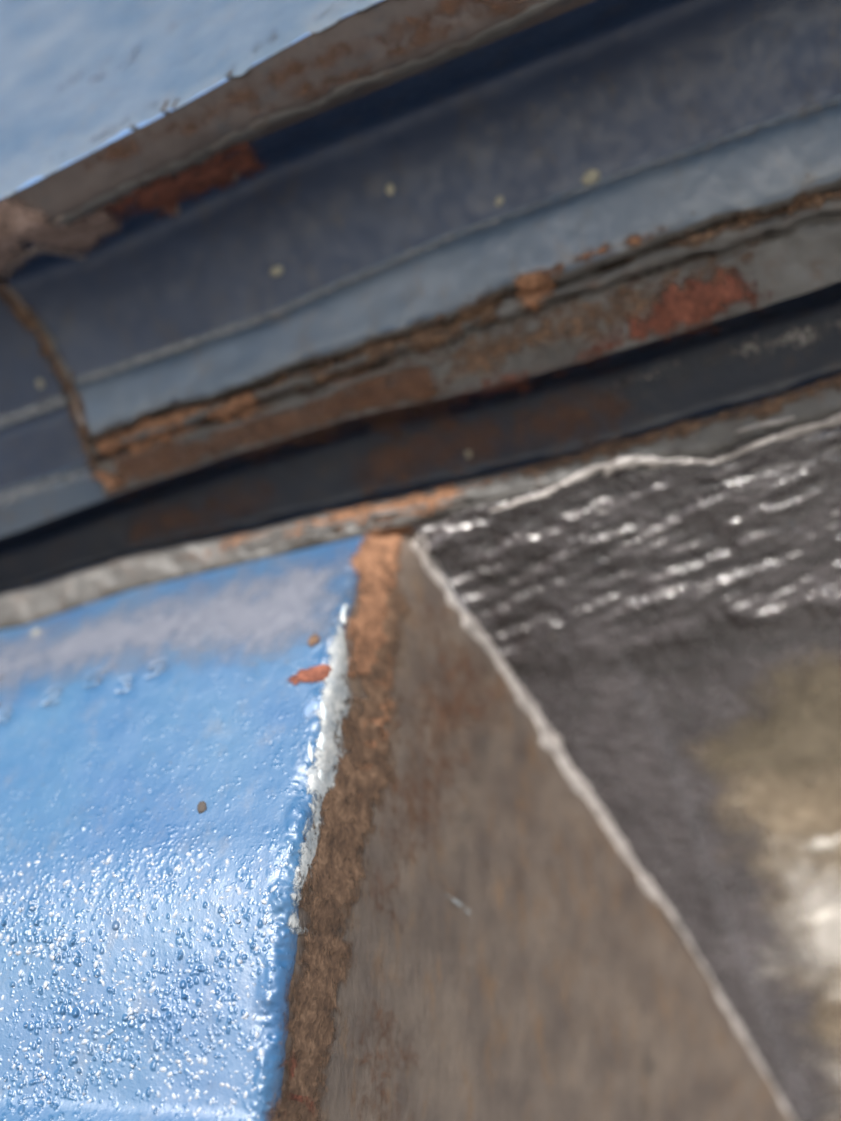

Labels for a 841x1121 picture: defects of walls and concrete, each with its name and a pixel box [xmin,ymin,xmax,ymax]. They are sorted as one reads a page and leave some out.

peeling [0,217,502,429]
peeling [0,0,564,282]
corrosion [91,229,664,493]
corrosion [573,268,771,364]
corrosion [671,190,841,248]
corrosion [208,372,841,1121]
damp [790,875,841,963]
damp [805,835,841,849]